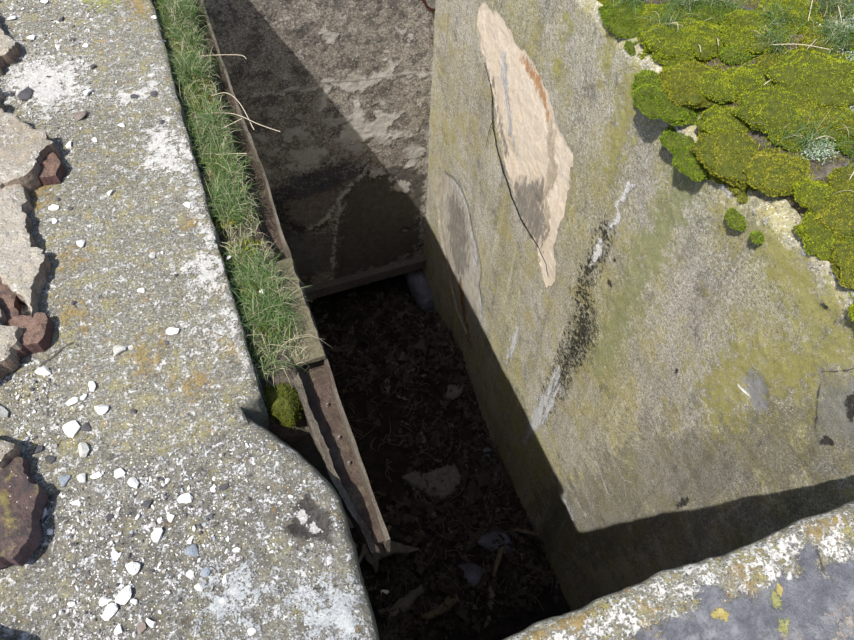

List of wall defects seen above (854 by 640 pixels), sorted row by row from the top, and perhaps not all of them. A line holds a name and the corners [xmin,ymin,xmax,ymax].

damp [236,57,432,114]
damp [271,116,430,288]
spalling [477,2,574,288]
damp [521,180,636,446]